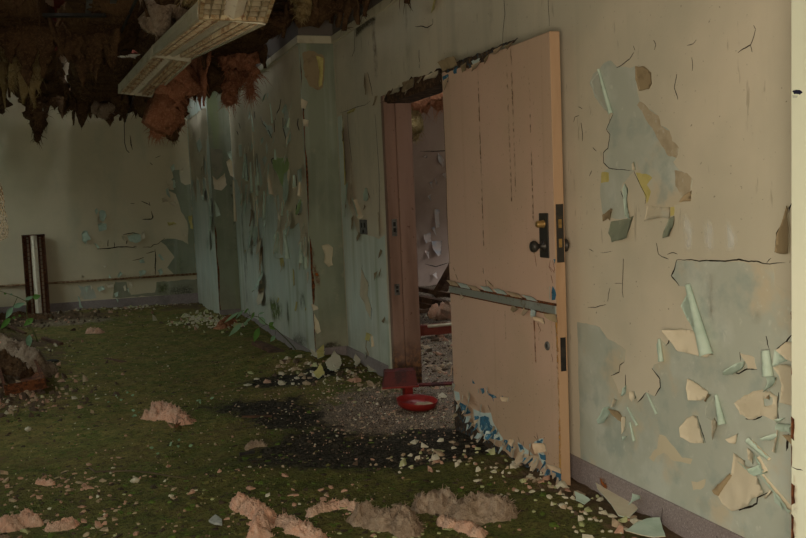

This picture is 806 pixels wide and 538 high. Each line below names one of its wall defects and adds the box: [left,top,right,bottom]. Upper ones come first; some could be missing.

peeling [48,108,248,335]
peeling [244,38,518,391]
peeling [424,150,557,331]
crack [656,243,782,265]
peeling [775,203,792,254]
peeling [390,367,641,538]
peeling [577,260,795,538]